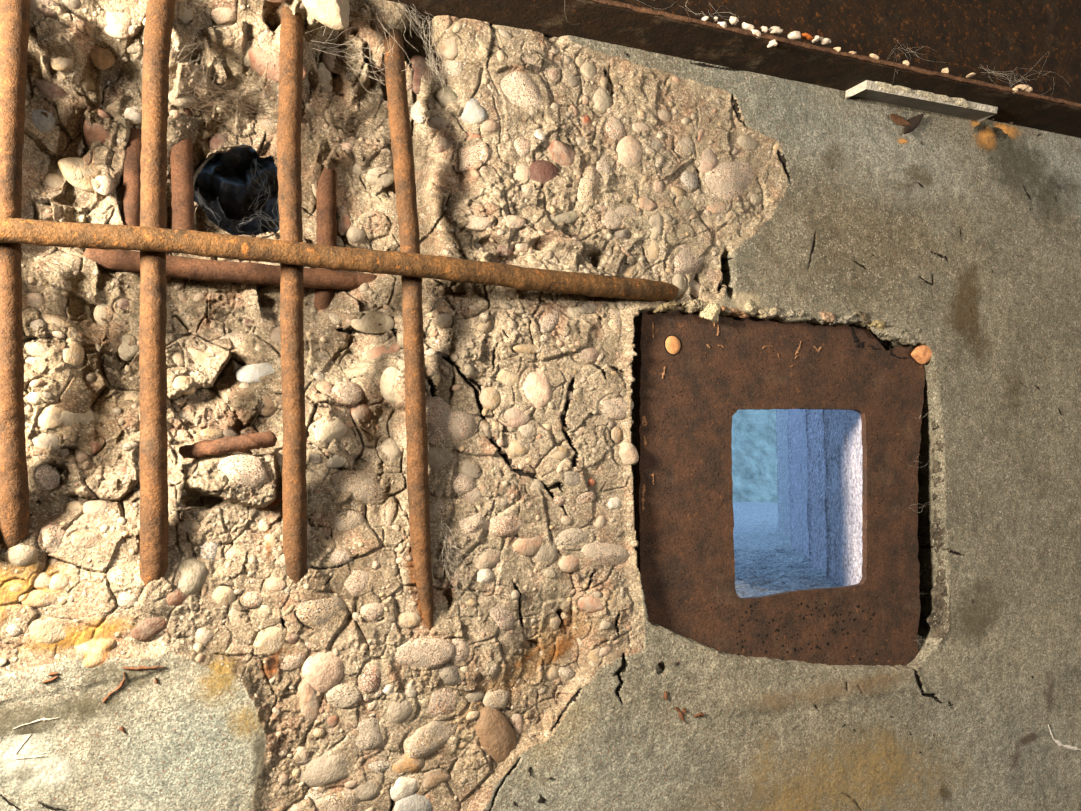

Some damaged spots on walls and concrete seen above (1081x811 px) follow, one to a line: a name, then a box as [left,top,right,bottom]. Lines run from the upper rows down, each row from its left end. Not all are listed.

spalling [811,310,927,345]
spalling [0,0,806,811]
crack [428,329,624,516]
corrosion [0,566,51,608]
corrosion [407,548,424,620]
crack [512,580,523,627]
corrosion [41,623,118,648]
crack [1048,725,1081,751]